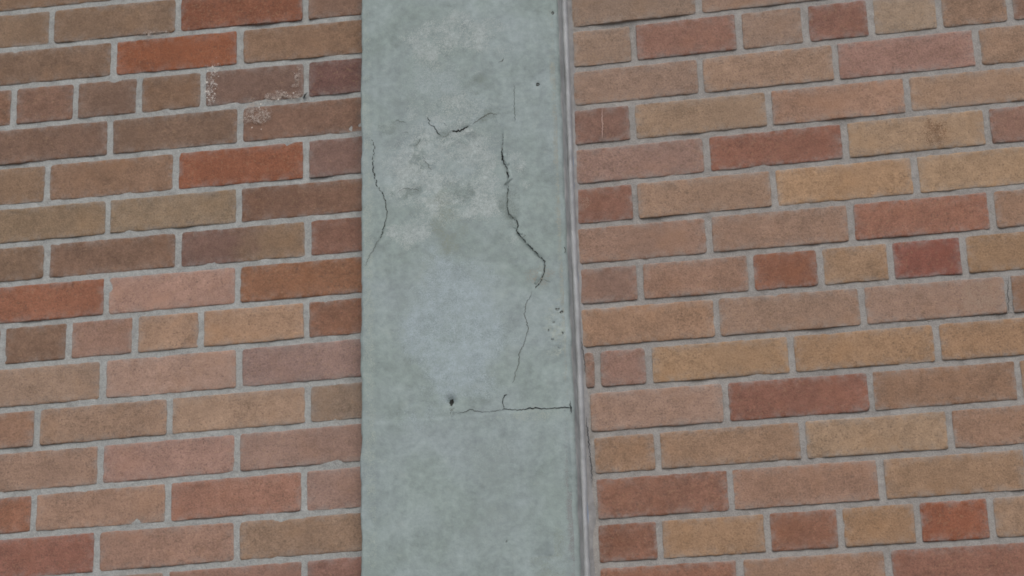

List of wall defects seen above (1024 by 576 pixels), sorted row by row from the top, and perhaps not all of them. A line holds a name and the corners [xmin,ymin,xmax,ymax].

crack [366,139,388,264]
crack [454,144,593,480]